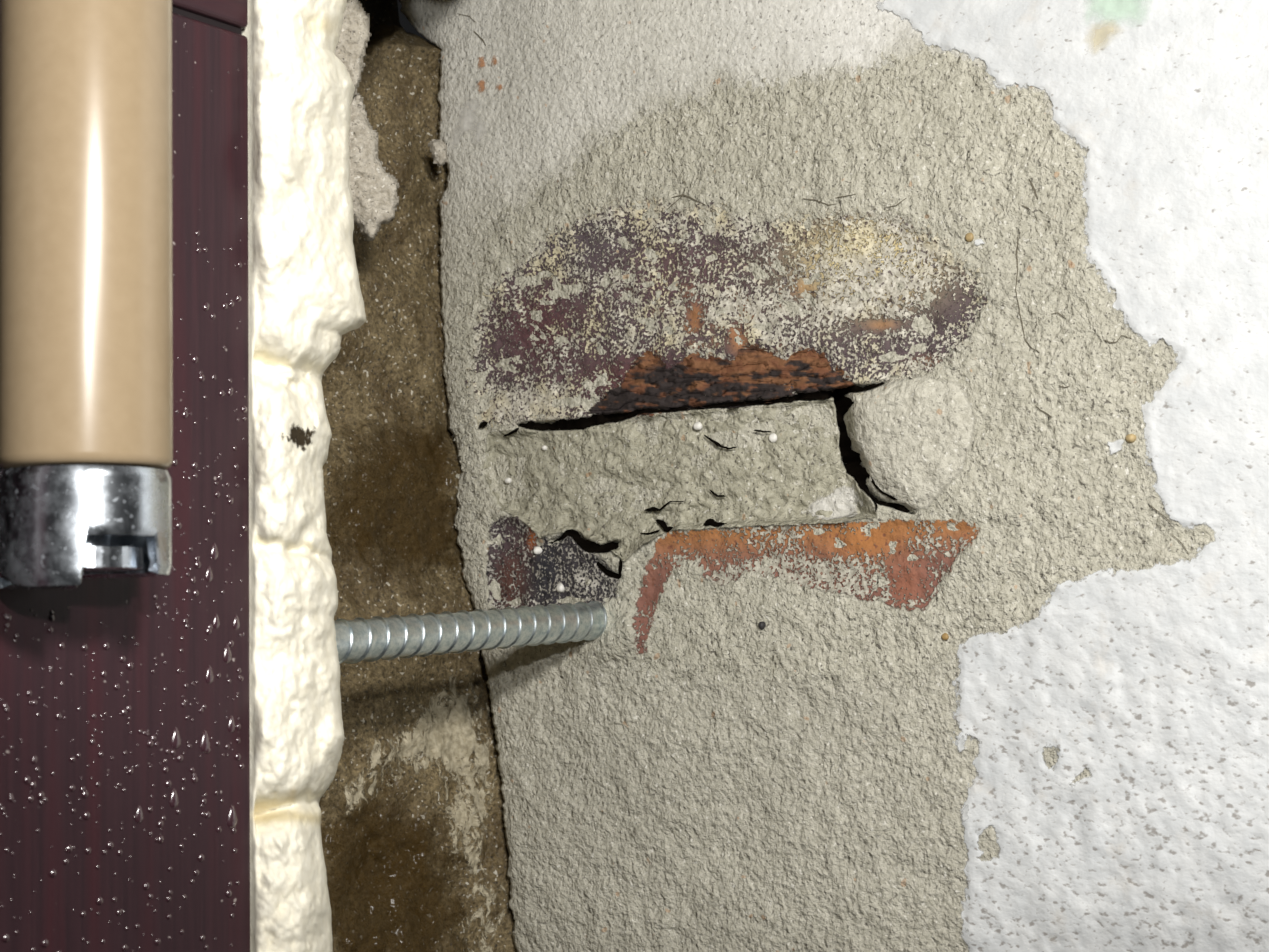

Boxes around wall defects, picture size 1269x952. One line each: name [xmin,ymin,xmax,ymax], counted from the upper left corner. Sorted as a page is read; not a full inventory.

water stain [326,431,455,567]
crack [550,489,727,579]
crack [479,382,912,514]
peeling [448,0,1269,952]
water stain [321,801,506,952]